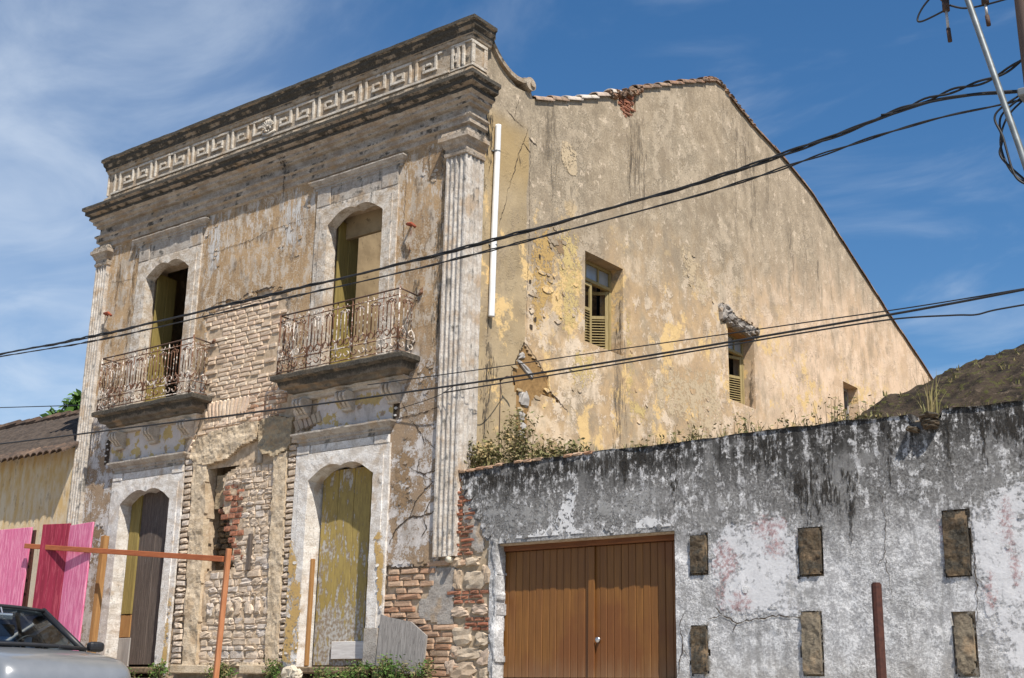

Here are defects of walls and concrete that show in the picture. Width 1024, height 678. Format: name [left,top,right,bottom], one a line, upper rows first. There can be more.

flaking render [607,85,644,118]
crack [499,102,568,412]
peeling [528,226,597,393]
spalling [209,440,273,570]
flaking render [185,286,322,472]
damp [668,447,681,503]
damp [746,432,860,555]
damp [880,420,915,487]
damp [943,420,951,471]
damp [967,405,1024,464]
flaking render [374,479,590,678]
crack [709,607,801,630]